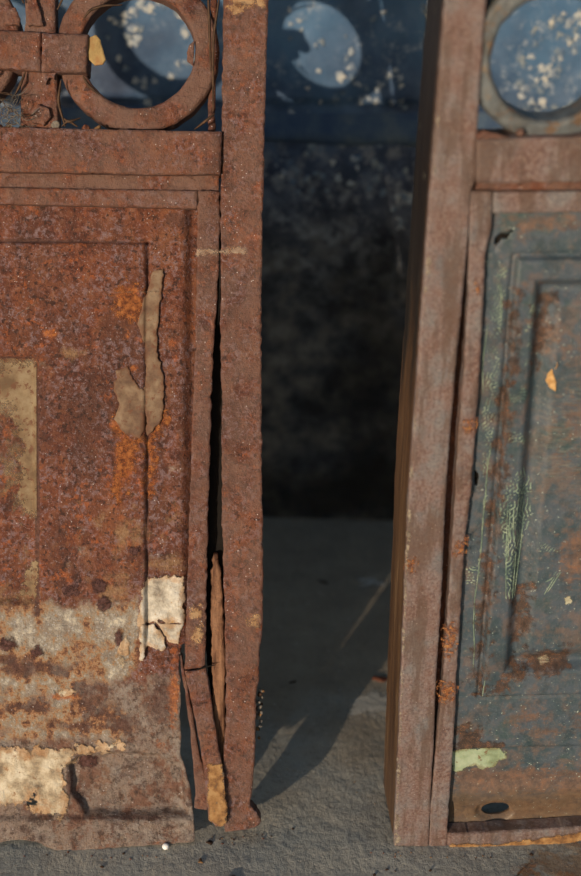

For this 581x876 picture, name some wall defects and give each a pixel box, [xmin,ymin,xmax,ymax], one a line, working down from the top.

peeling [226,0,265,14]
peeling [114,269,164,439]
rust [107,405,176,506]
rust [469,283,571,697]
rust [62,579,111,612]
rust [0,637,17,652]
rust [30,645,44,658]
spalling [117,575,203,668]
peeling [0,739,126,823]
rust [78,755,98,768]
peeling [452,722,507,772]
rust [450,832,581,847]